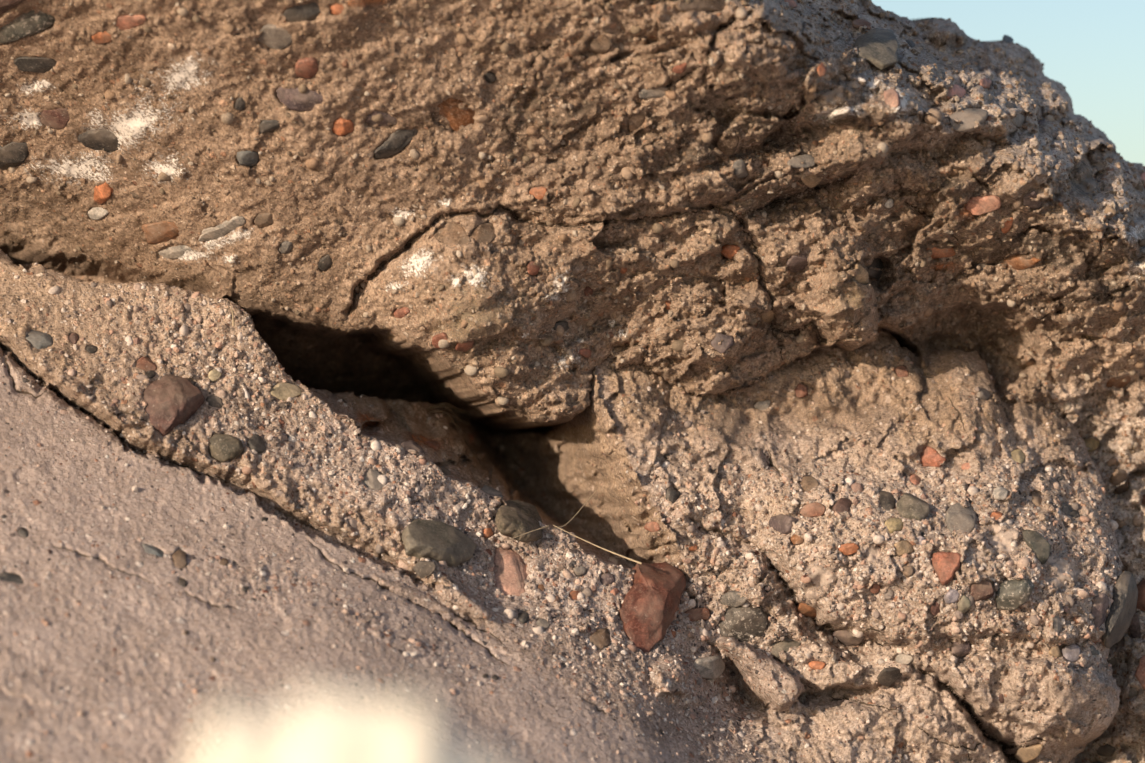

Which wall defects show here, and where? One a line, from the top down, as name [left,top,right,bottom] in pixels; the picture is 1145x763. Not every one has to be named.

crack [508,43,562,108]
crack [667,11,754,87]
crack [348,170,862,397]
crack [0,344,218,480]
crack [50,543,156,584]
crack [184,590,240,610]